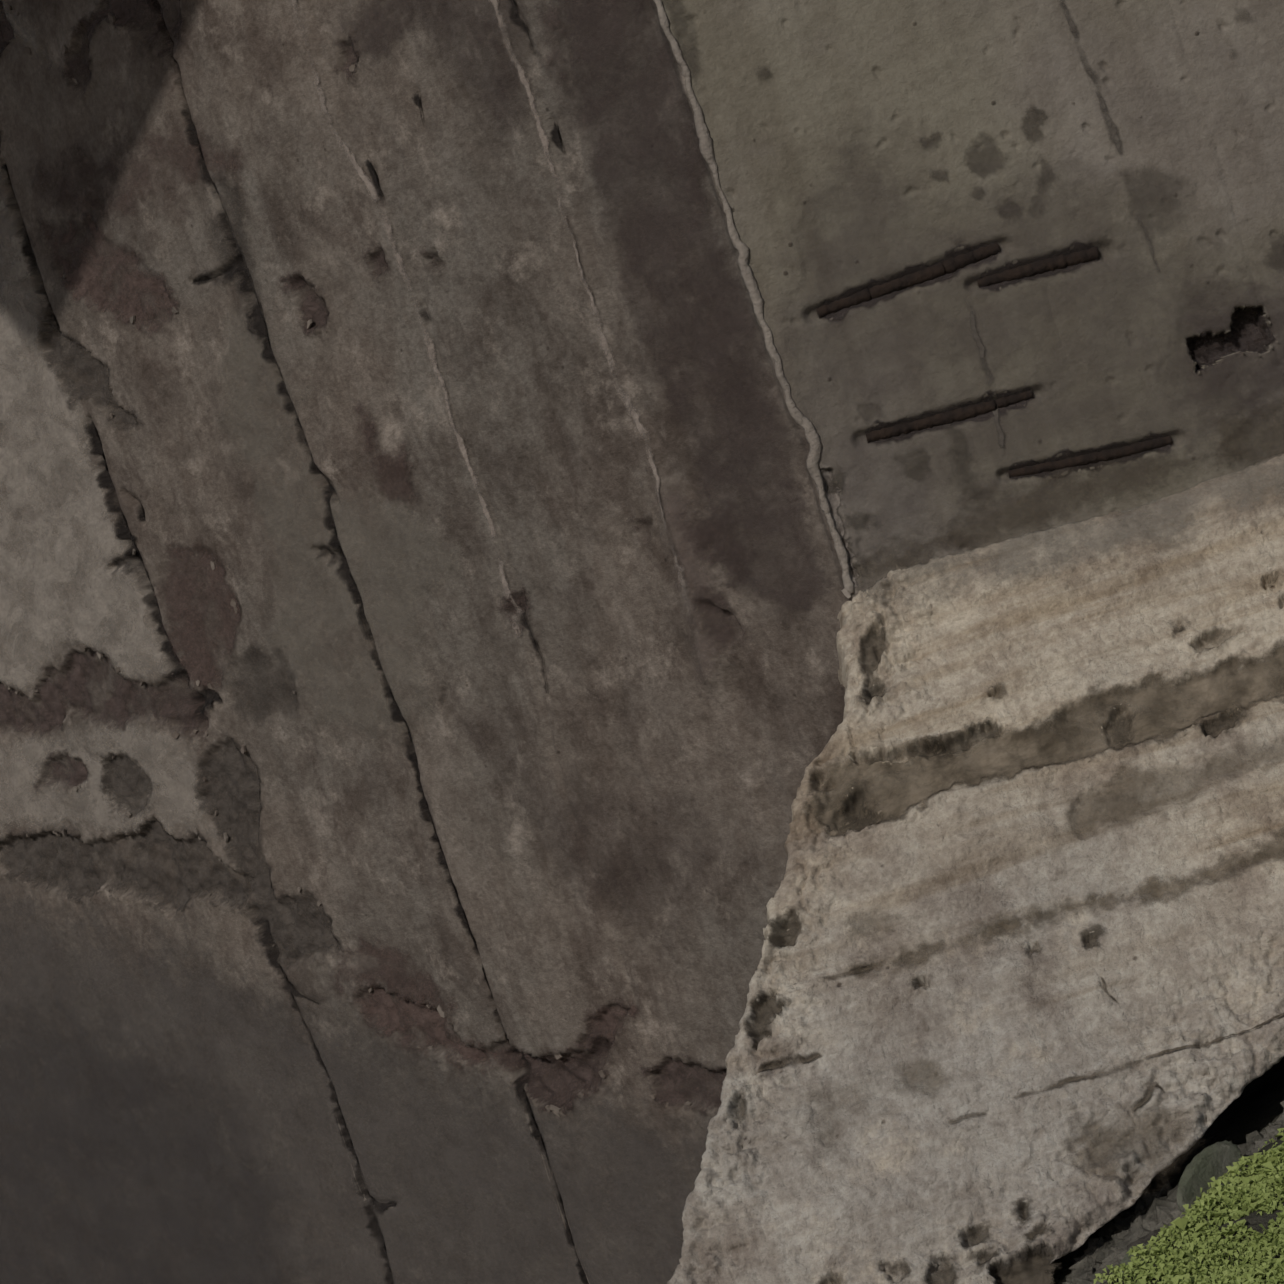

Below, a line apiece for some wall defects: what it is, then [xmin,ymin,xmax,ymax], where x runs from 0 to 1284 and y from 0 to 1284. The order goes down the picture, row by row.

crack [510,0,532,45]
crack [2,164,62,334]
spalling [816,241,1100,321]
spalling [1186,307,1275,373]
spalling [865,387,1034,444]
spalling [1008,433,1172,480]
crack [86,422,222,715]
crack [181,111,589,1284]
water stain [0,898,707,1284]
crack [757,1053,820,1073]
crack [950,1113,985,1123]
crack [1014,1013,1284,1111]